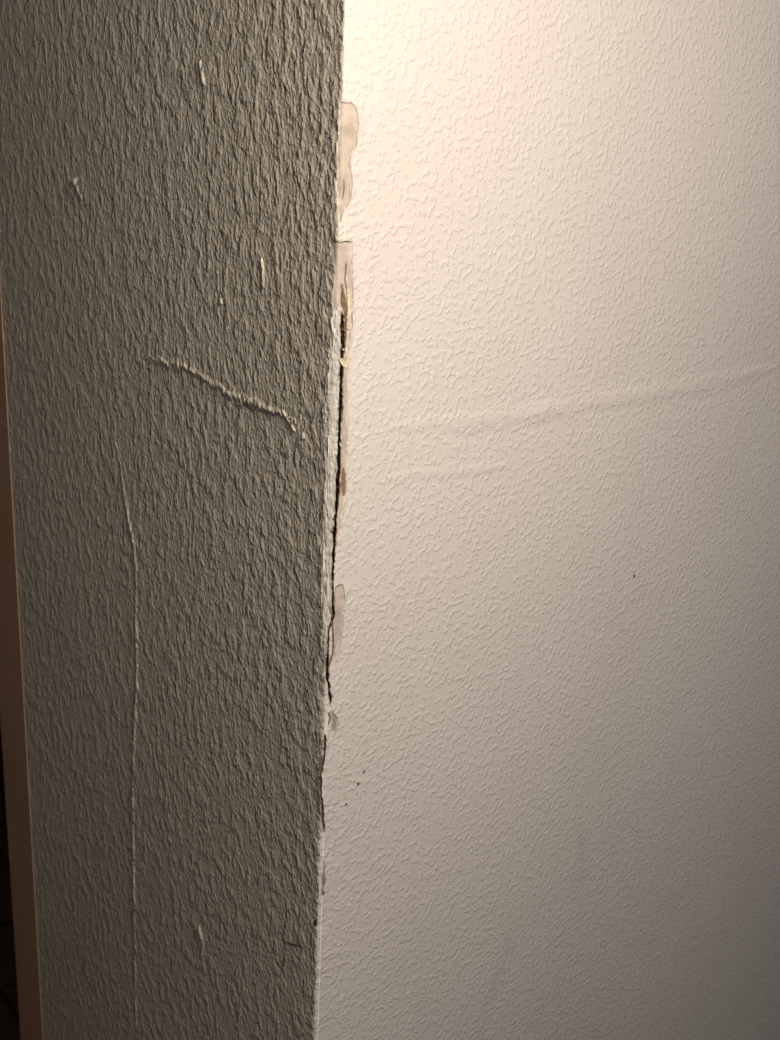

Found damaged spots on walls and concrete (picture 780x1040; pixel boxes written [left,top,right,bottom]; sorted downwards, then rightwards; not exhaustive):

peeling [337,102,360,223]
crack [317,311,351,832]